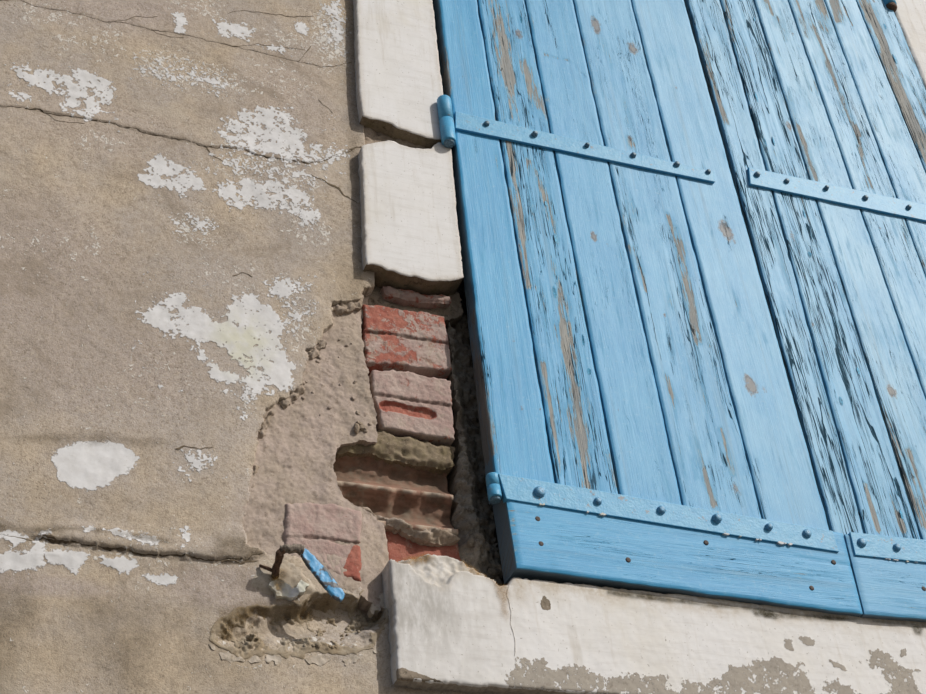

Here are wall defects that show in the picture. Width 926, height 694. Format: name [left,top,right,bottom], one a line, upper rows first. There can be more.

crack [0,0,351,67]
peeling [171,12,188,34]
peeling [5,62,121,124]
crack [3,106,362,203]
peeling [138,102,350,232]
peeling [51,440,140,492]
spalling [135,273,389,666]
peeling [0,525,178,586]
crack [3,533,263,564]
peeling [505,636,861,694]
peeling [860,648,922,694]